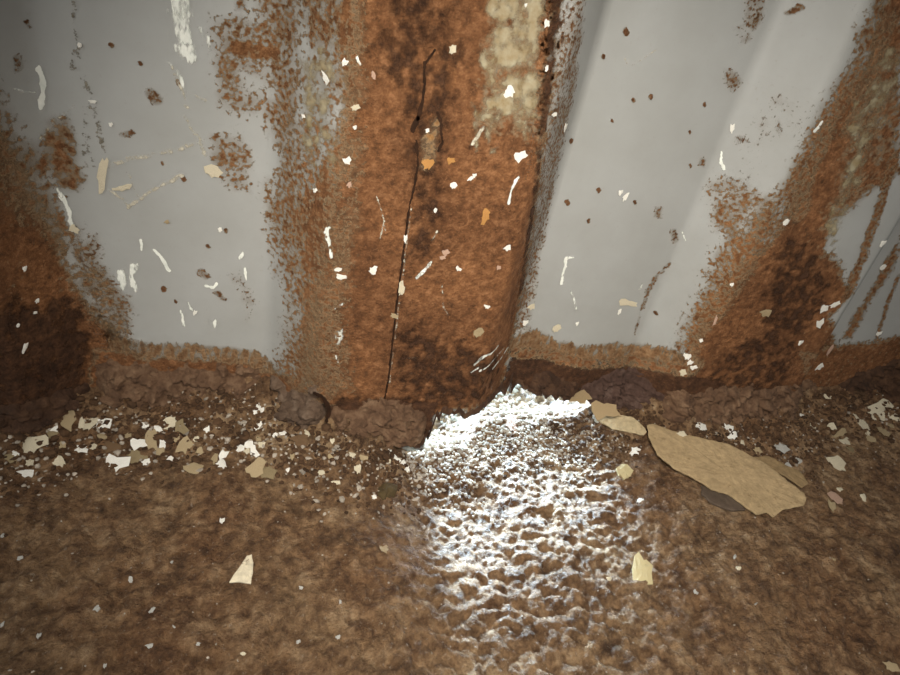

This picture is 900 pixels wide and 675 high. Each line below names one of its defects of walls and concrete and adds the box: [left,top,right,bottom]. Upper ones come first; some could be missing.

crack [383,49,443,399]
rust [0,0,900,451]